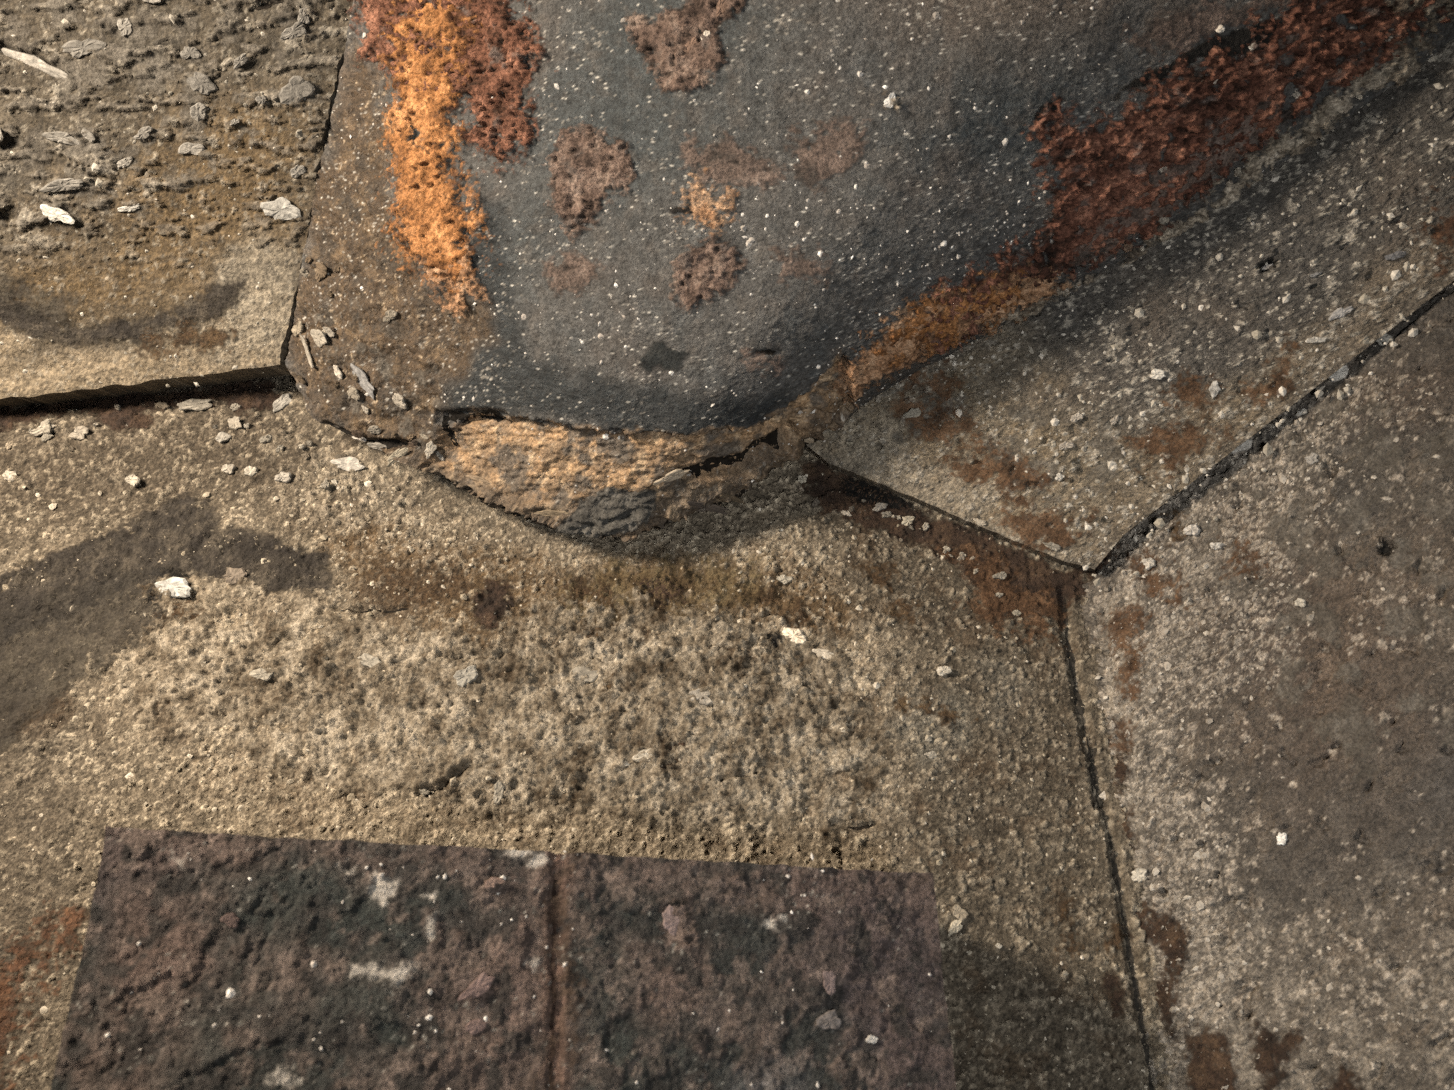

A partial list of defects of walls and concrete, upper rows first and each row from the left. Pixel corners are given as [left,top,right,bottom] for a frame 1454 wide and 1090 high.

rust [346,0,556,318]
rust [670,168,739,234]
rust [833,0,1454,410]
damp [0,492,334,751]
rust [798,460,1087,649]